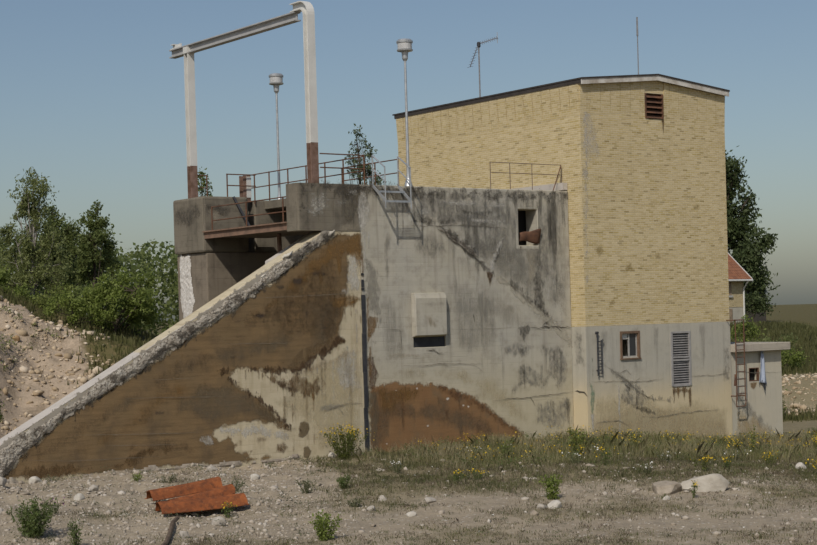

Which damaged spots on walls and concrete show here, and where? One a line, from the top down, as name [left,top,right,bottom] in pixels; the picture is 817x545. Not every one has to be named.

spalling [0,230,340,477]
leakage [4,234,365,480]
crack [413,223,572,341]
crack [497,365,710,425]